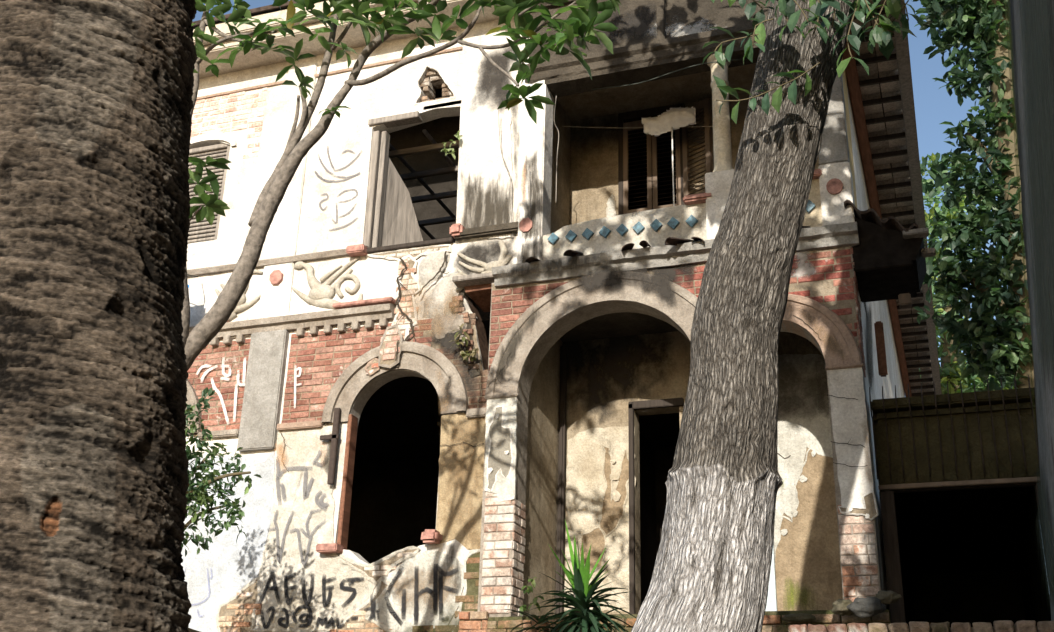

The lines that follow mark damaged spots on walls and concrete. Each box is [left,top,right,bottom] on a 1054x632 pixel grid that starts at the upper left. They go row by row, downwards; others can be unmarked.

leakage [457,156,693,303]
flaking render [364,244,451,375]
leakage [563,332,668,420]
flaking render [436,405,513,625]
peeling [774,354,879,611]
flaking render [329,546,421,632]